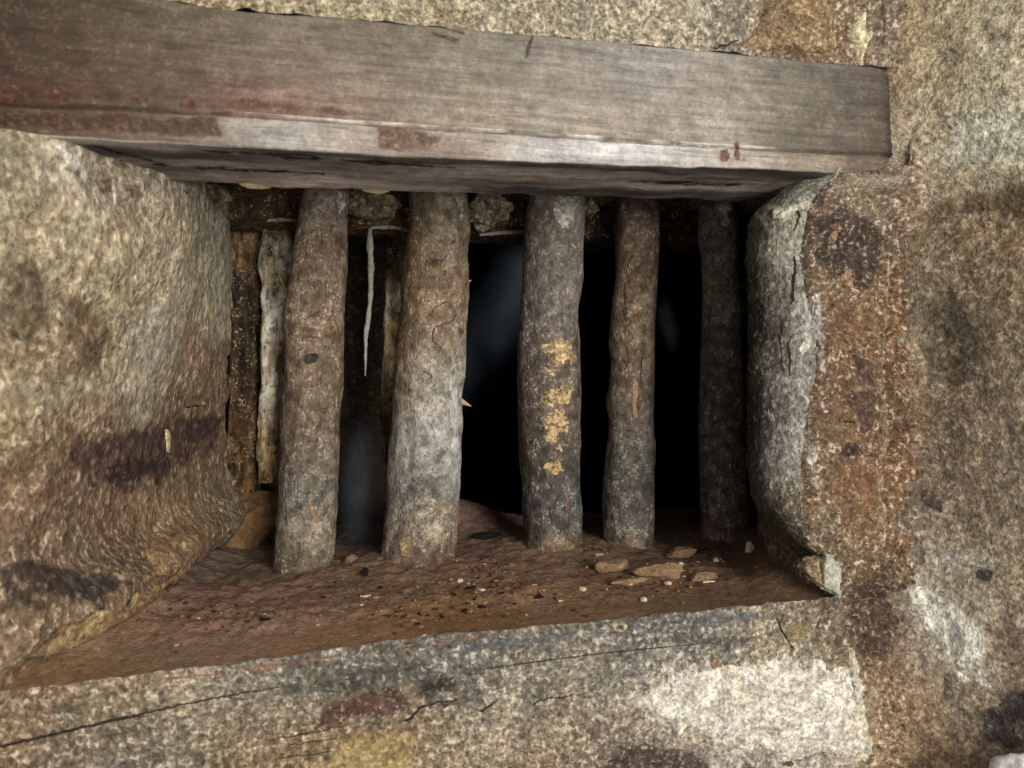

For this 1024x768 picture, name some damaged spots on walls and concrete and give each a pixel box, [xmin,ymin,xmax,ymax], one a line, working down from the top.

water stain [69,406,222,494]
water stain [0,558,132,611]
crack [480,643,704,670]
crack [0,684,296,748]
crack [404,698,457,722]
crack [533,694,583,706]